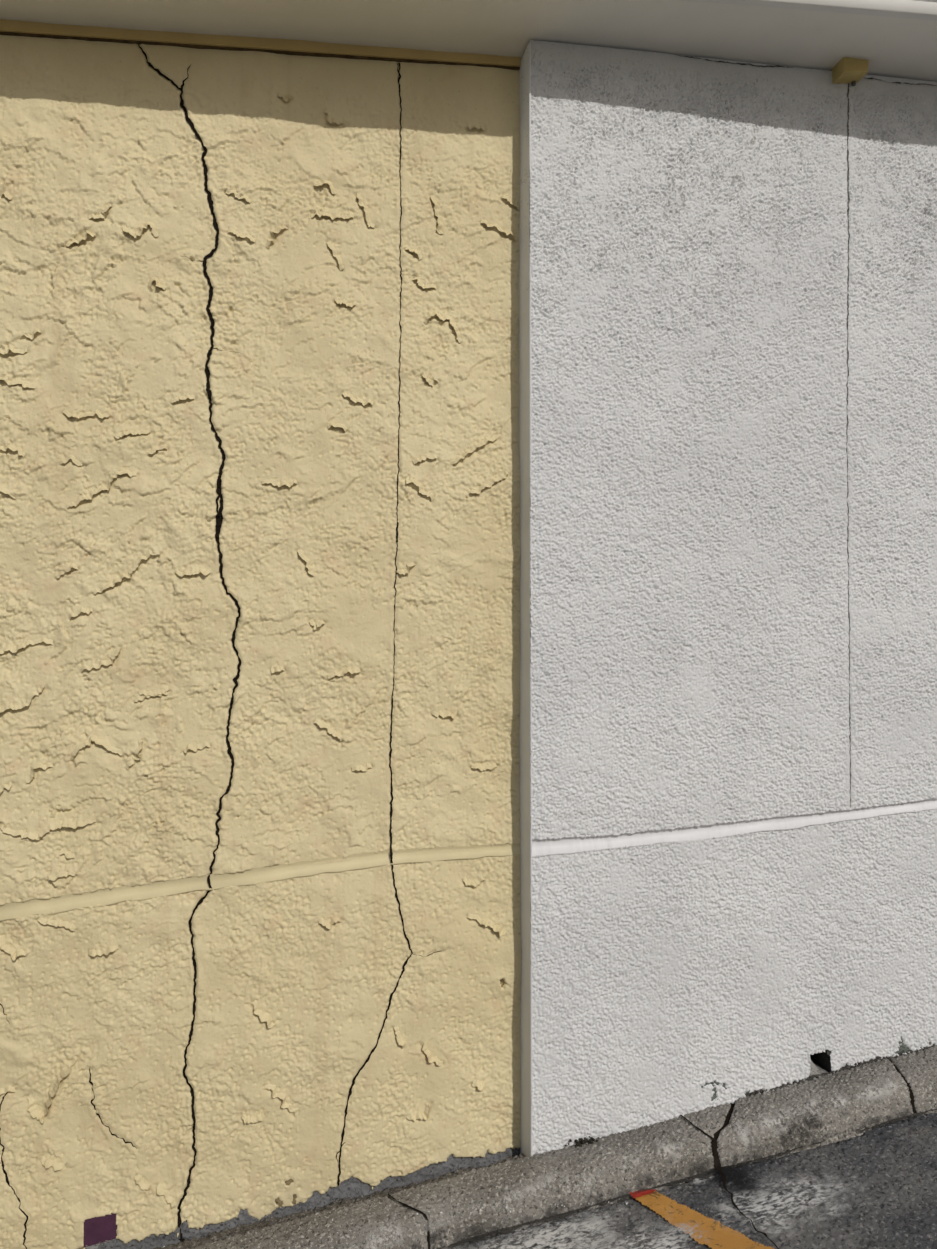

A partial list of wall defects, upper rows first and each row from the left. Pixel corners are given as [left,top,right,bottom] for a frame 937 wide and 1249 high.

crack [138,44,241,1237]
crack [336,63,447,1186]
crack [0,1092,28,1249]
crack [89,1069,135,1147]
crack [680,1103,779,1249]
spalling [745,1037,935,1097]